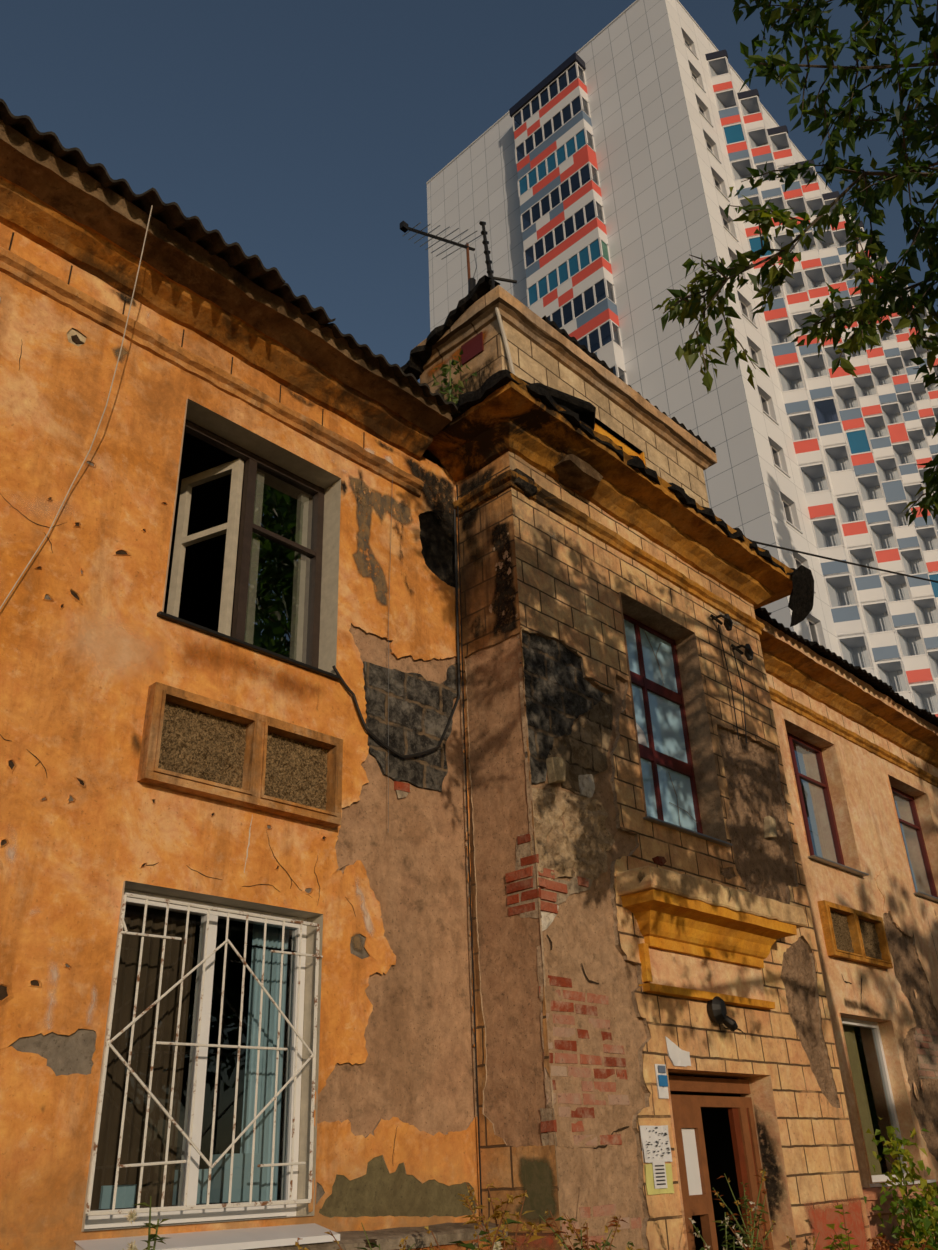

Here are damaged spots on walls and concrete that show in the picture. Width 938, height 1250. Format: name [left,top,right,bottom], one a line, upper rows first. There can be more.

flaking render [412,506,460,592]
peeling [493,547,511,575]
peeling [714,719,801,905]
peeling [0,1018,102,1084]
peeling [308,605,666,1250]
peeling [874,866,938,1166]